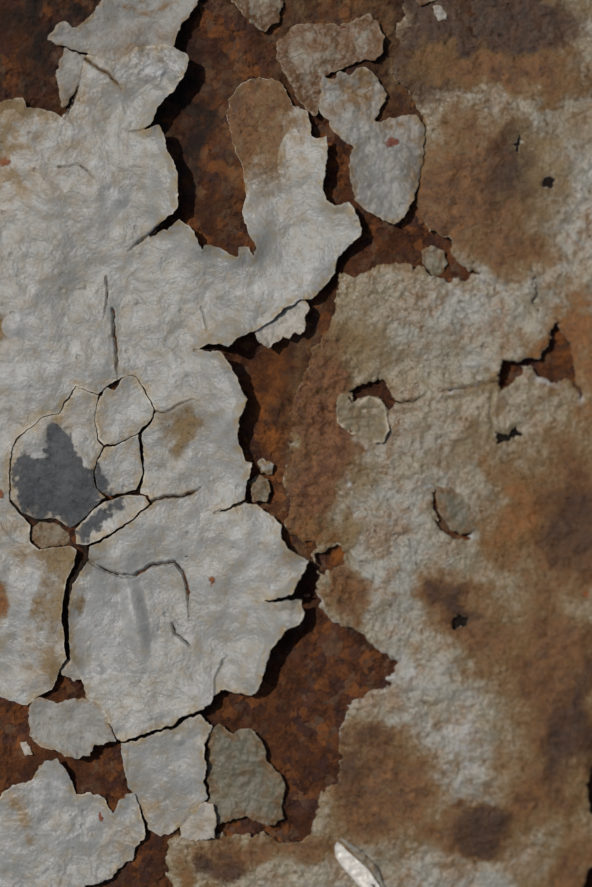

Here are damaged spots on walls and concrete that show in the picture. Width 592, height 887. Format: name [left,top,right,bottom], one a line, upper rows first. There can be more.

peeling [410,0,447,23]
corrosion [227,78,299,178]
spalling [301,207,476,335]
spalling [498,323,583,399]
crack [9,278,198,656]
corrosion [162,407,202,456]
peeling [0,0,425,887]
corrosion [0,584,9,617]
corrosion [24,546,75,630]
corrosion [175,285,592,887]
spalling [583,867,592,887]